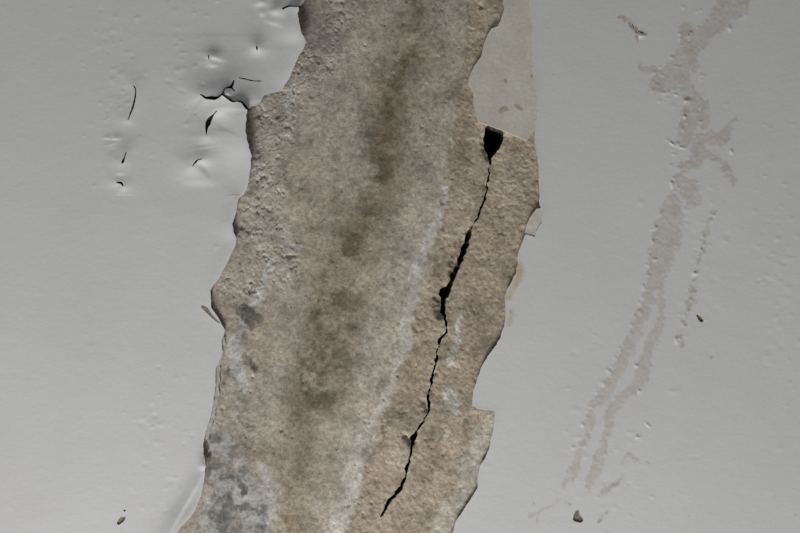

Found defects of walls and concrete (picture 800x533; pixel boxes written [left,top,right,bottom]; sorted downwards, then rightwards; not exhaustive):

peeling [165,0,393,533]
peeling [314,0,542,533]
crack [380,126,503,516]
leakage [527,0,752,521]